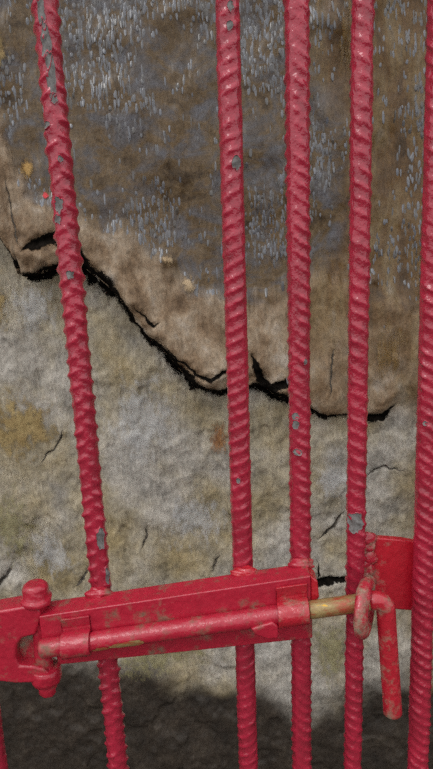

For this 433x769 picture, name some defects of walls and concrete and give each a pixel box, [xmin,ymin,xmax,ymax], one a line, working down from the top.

leakage [0,39,28,139]
leakage [58,0,216,144]
leakage [239,0,285,118]
leakage [309,0,352,63]
leakage [17,162,52,207]
leakage [79,171,223,263]
leakage [245,167,287,268]
leakage [310,92,350,227]
leakage [370,0,427,301]